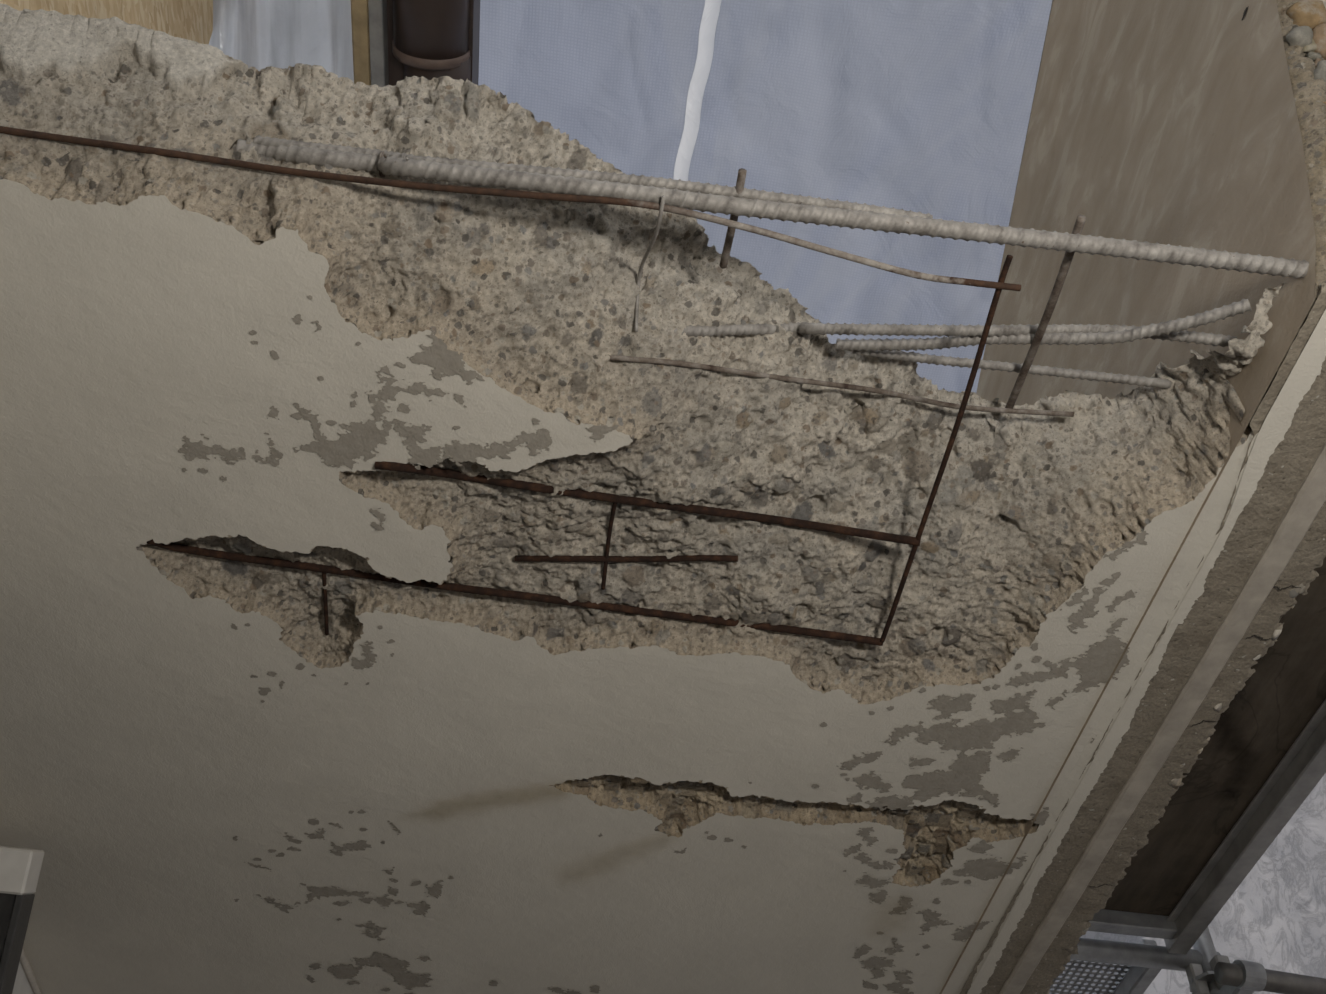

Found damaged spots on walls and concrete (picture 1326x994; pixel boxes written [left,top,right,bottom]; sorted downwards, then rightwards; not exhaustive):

spalling [1276,0,1326,301]
spalling [0,3,1309,705]
spalling [549,618,1130,904]
peeling [247,809,401,872]
peeling [257,867,454,994]
peeling [852,931,914,994]
peeling [888,896,993,956]